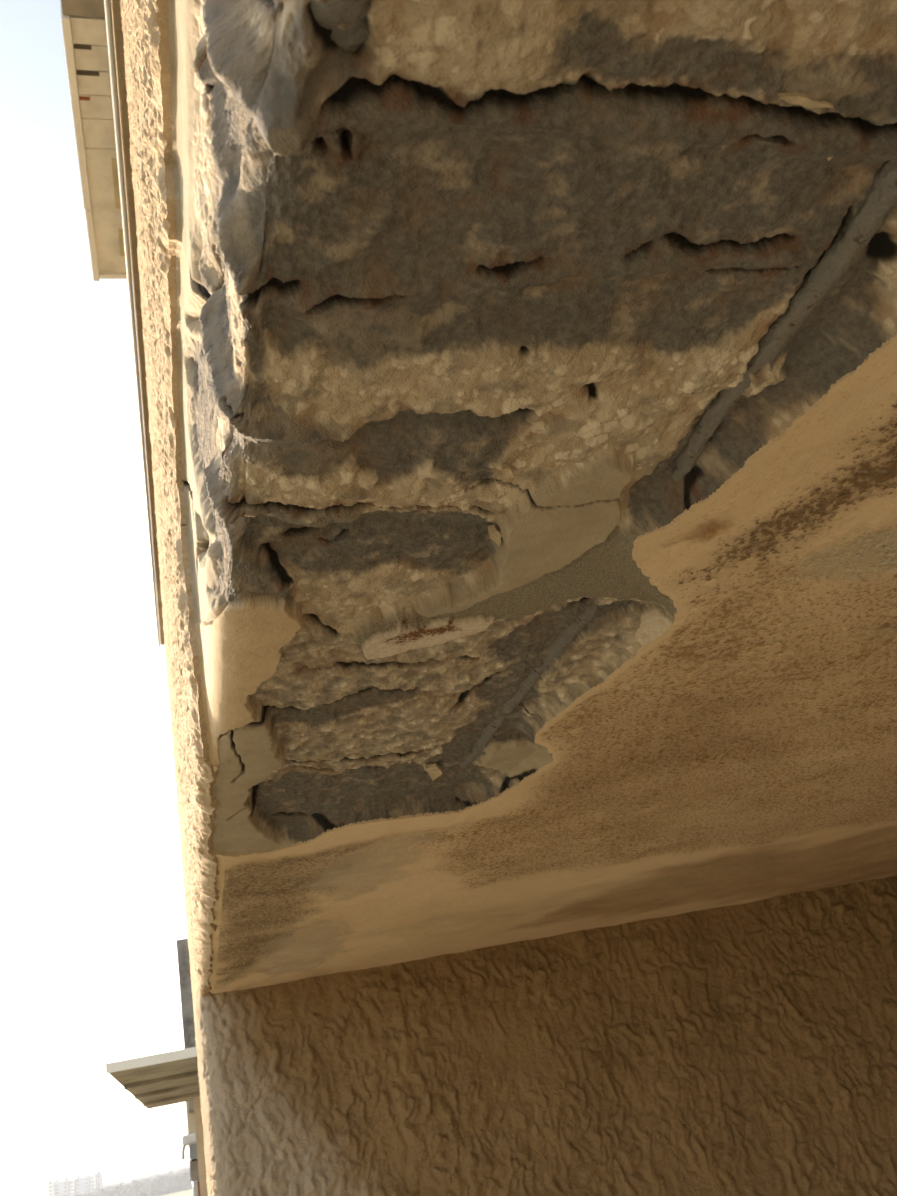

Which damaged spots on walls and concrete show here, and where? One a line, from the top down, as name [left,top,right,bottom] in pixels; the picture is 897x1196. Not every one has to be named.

spalling [168,0,897,856]
corrosion [387,618,462,644]
water stain [421,404,897,888]
crack [228,730,249,819]
water stain [216,843,369,984]